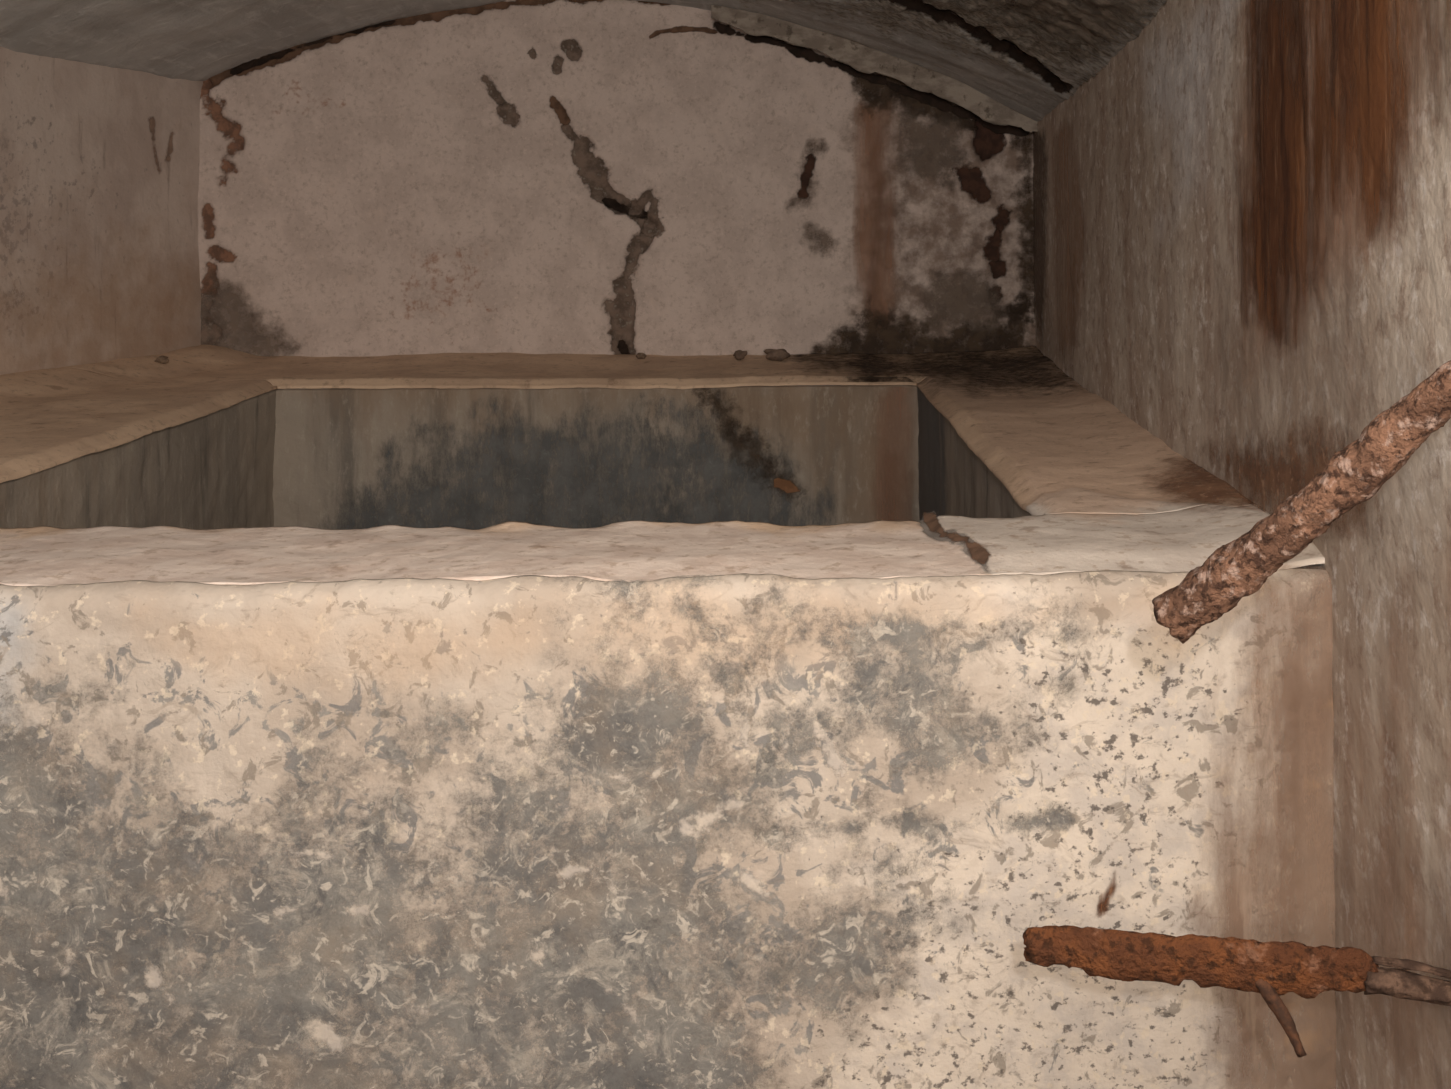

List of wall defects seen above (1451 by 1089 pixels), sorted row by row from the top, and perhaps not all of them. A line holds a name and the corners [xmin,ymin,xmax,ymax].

crack [549,96,665,355]
crack [209,0,1028,136]
damp [852,73,977,187]
damp [793,127,1076,396]
crack [888,0,1073,93]
corrosion [1241,0,1431,342]
damp [337,402,831,530]
corrosion [1022,360,1451,1089]